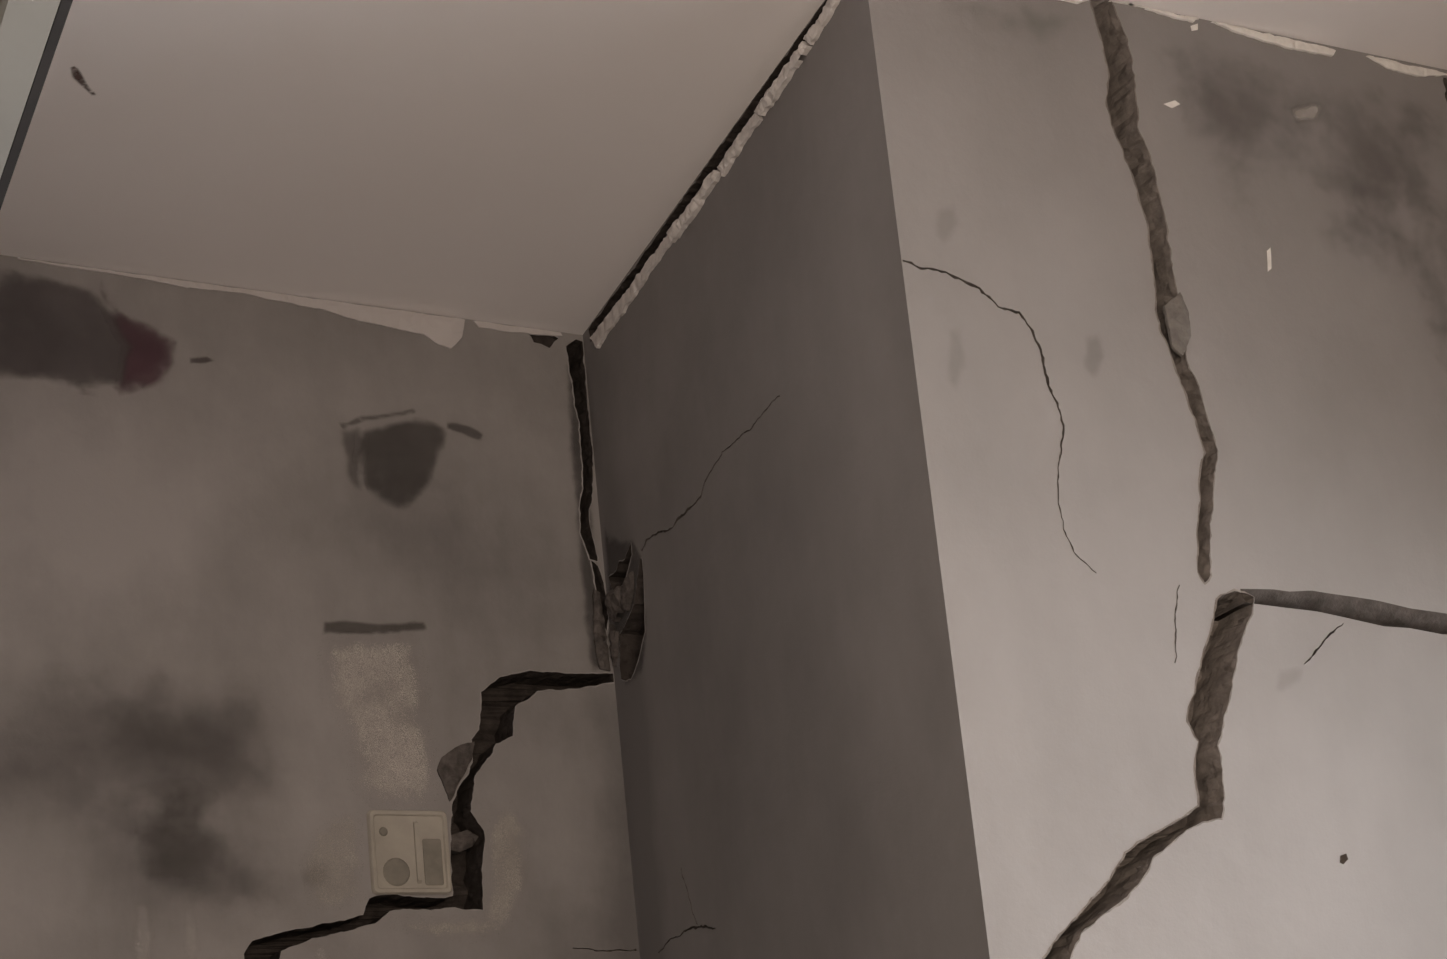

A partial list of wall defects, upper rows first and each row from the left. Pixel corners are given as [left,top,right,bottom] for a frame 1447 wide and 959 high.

leakage [0,282,169,385]
leakage [364,423,441,503]
crack [242,0,840,959]
crack [903,260,1097,573]
crack [1042,0,1447,959]